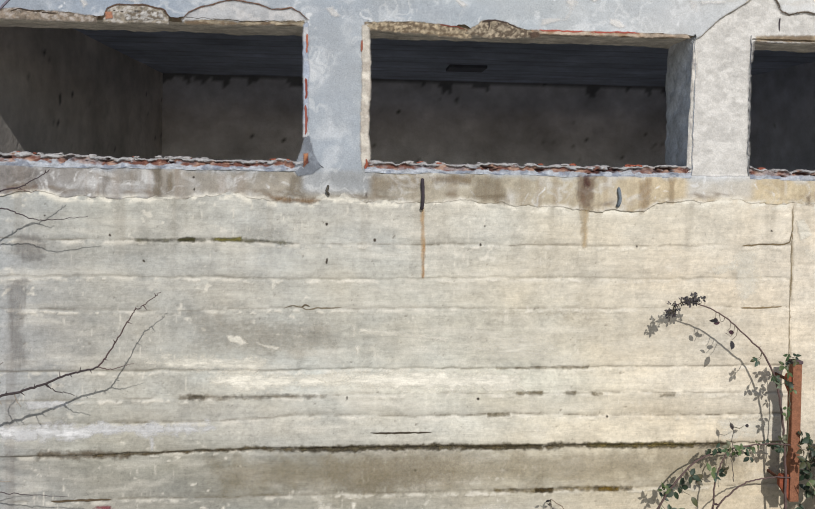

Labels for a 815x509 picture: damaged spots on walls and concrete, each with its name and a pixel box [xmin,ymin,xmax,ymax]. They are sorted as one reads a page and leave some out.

peeling [183,0,324,176]
peeling [360,0,815,177]
leakage [581,177,592,245]
crack [741,212,794,348]